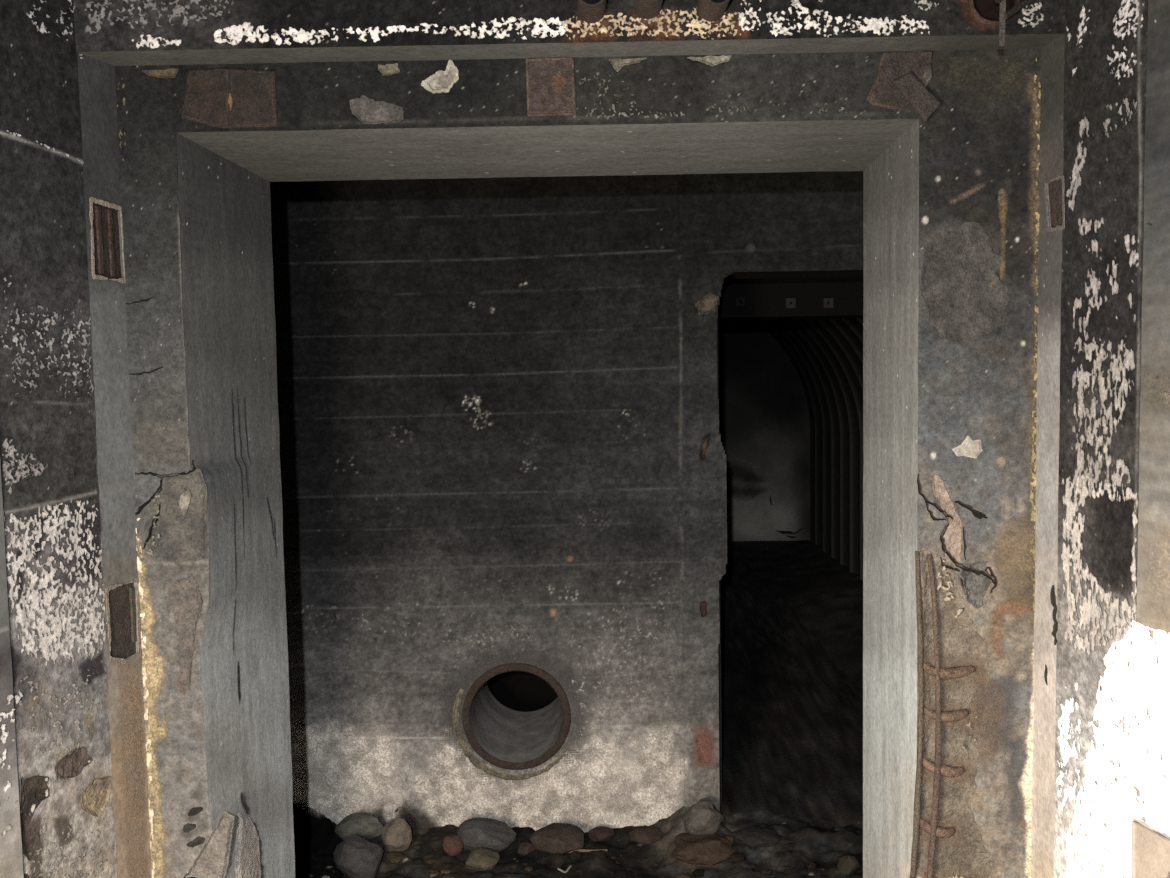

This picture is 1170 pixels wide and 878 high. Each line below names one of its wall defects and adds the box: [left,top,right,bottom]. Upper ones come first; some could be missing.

peeling [1103,98,1138,138]
crack [135,460,195,553]
crack [917,474,997,593]
peeling [1056,116,1170,878]
spalling [916,474,995,878]
crack [241,793,264,878]